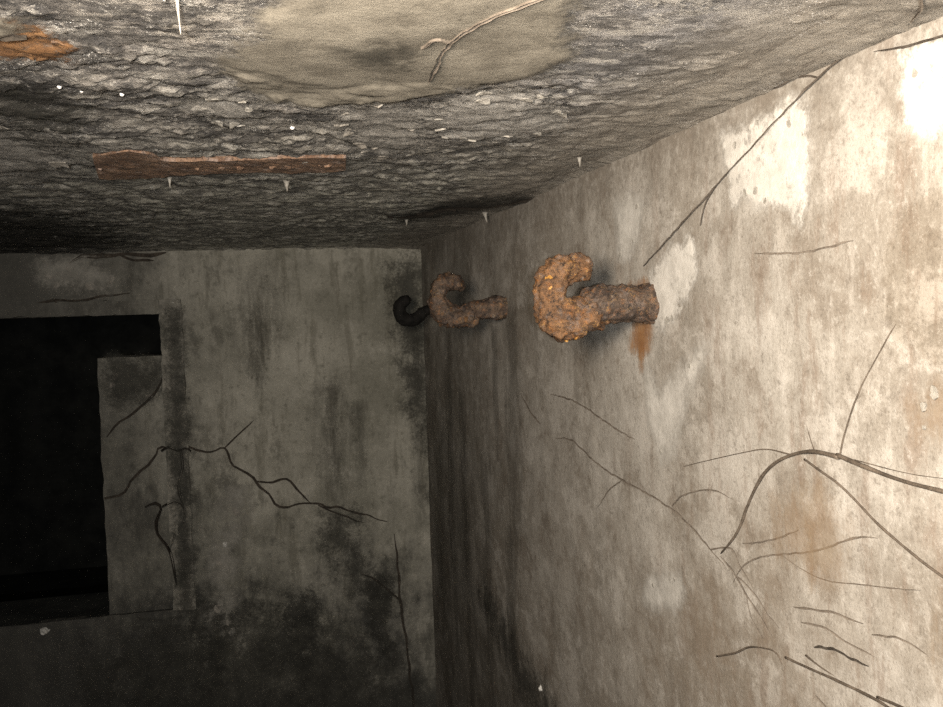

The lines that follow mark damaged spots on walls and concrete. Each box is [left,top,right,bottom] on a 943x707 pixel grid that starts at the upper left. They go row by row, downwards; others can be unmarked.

rust [0,21,77,61]
rust [93,150,346,180]
crack [643,56,853,266]
rust [631,322,651,361]
crack [104,421,415,707]